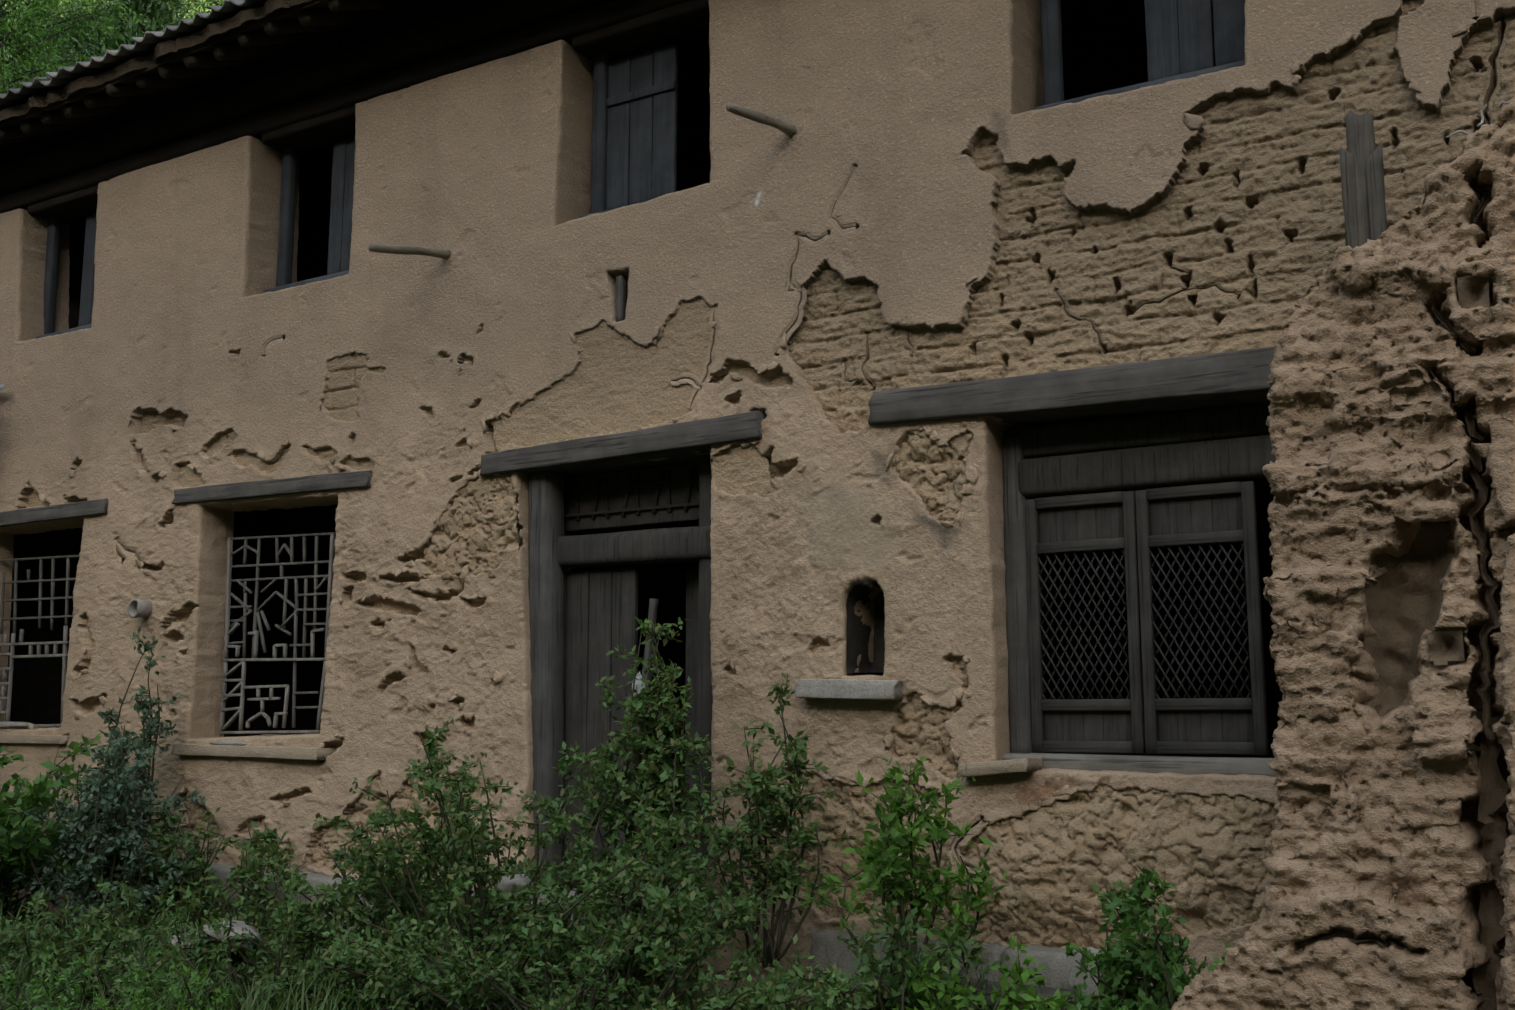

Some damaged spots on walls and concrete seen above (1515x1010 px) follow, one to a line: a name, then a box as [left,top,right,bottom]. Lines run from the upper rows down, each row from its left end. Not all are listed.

crack [1477,14,1515,125]
crack [774,166,857,354]
spalling [459,0,1515,449]
crack [1432,302,1475,354]
spalling [178,348,386,488]
spalling [713,439,776,497]
spalling [885,425,979,528]
spalling [361,469,520,601]
crack [1430,368,1515,1010]
spalling [179,787,266,861]
spalling [276,789,312,808]
spalling [289,773,485,882]